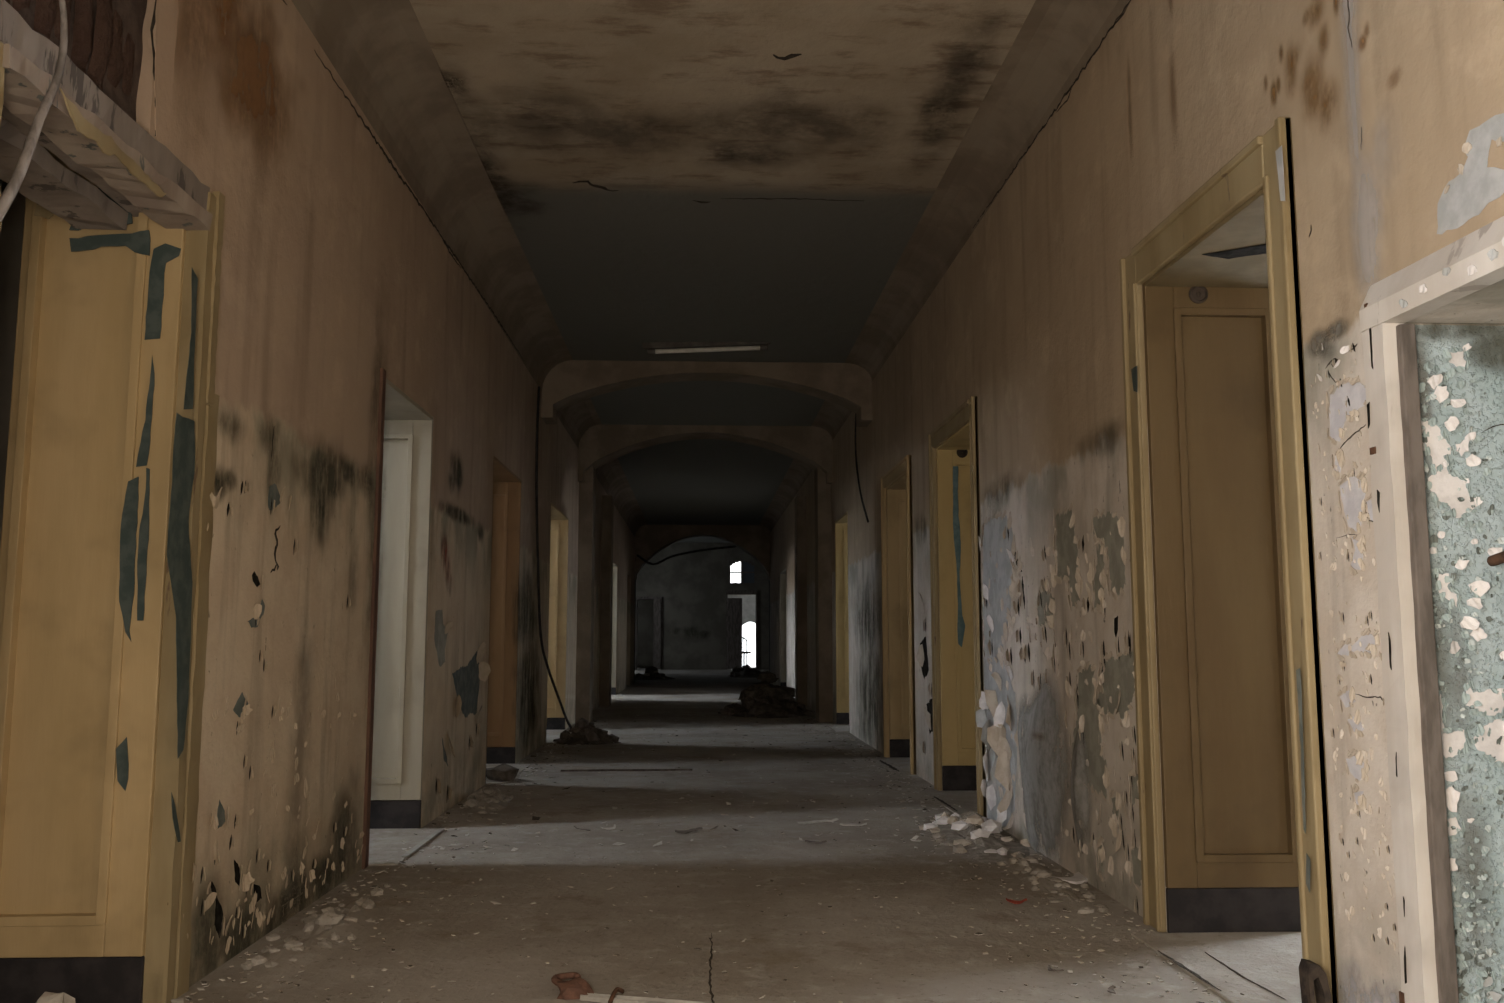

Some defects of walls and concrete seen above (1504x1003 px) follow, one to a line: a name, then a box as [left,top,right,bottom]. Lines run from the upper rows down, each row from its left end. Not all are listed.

peeling [1437,113,1504,234]
peeling [976,502,1142,912]
peeling [1311,343,1396,951]
peeling [1417,343,1504,1003]